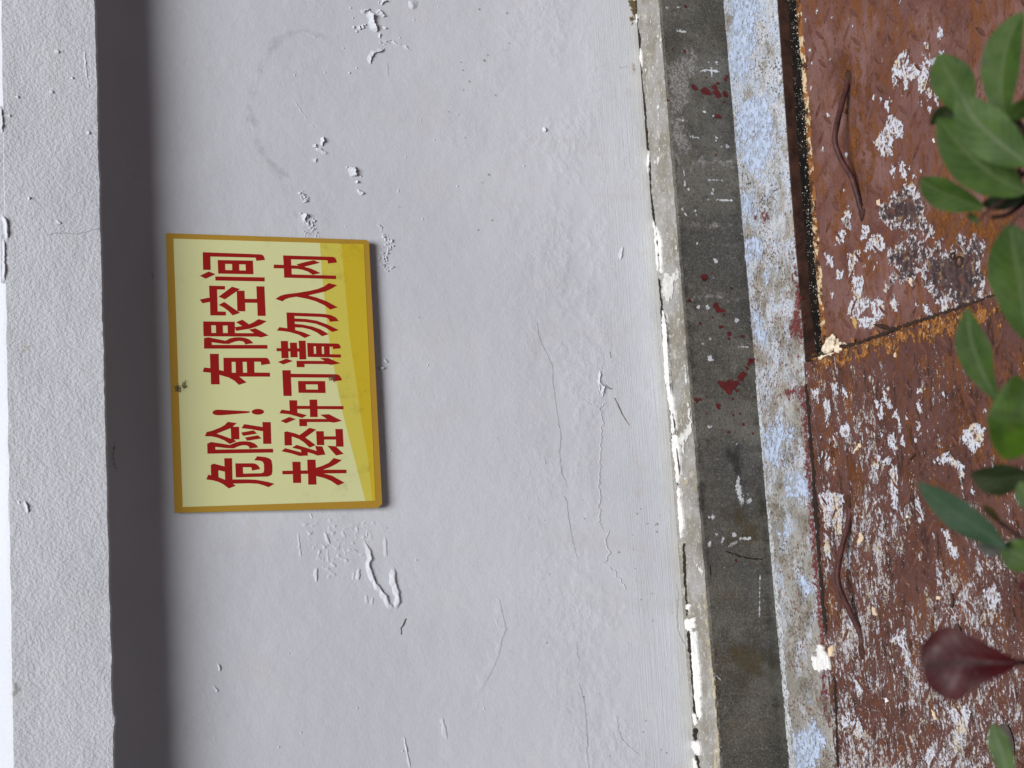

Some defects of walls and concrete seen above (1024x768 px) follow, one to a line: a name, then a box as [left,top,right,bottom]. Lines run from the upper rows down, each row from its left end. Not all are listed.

peeling [352,0,411,64]
spalling [298,191,320,238]
spalling [345,166,364,196]
peeling [728,0,775,288]
rust [795,0,1015,376]
peeling [652,220,685,539]
peeling [751,309,768,350]
peeling [755,379,826,768]
peeling [684,604,703,726]
peeling [691,740,702,768]